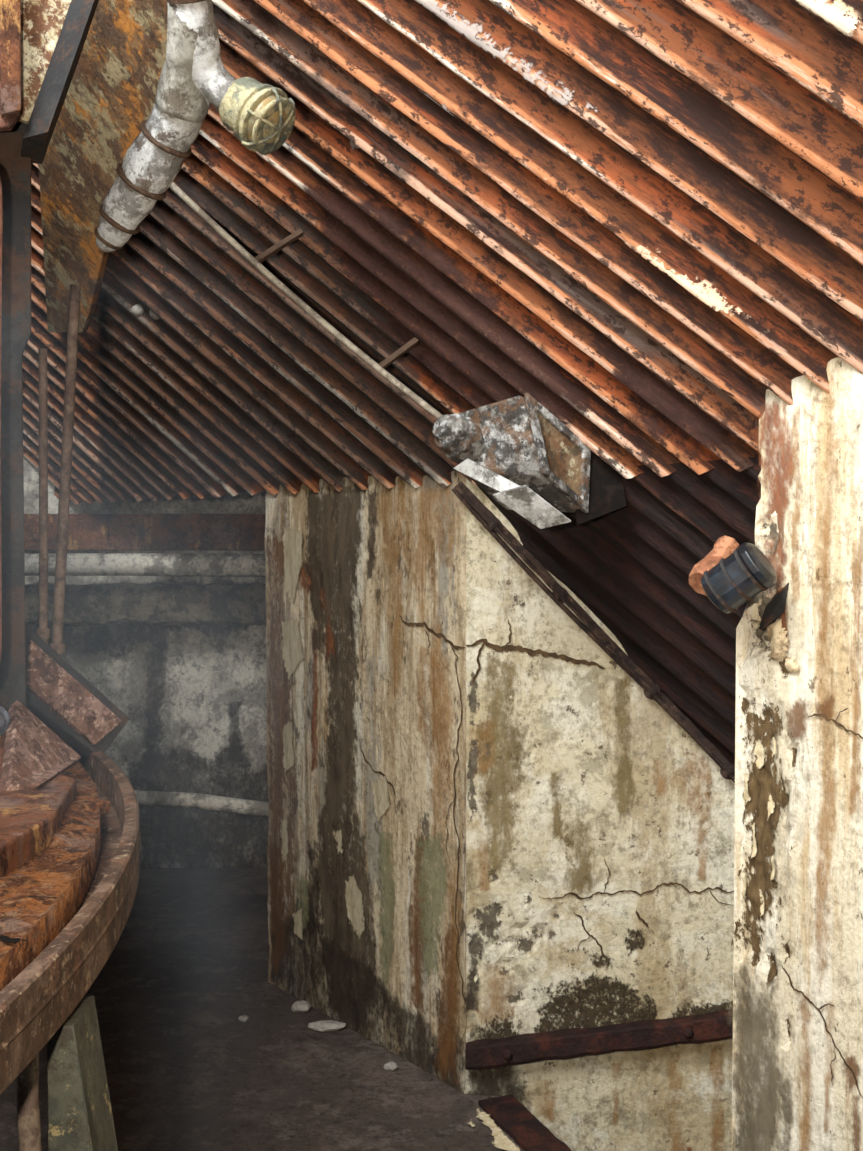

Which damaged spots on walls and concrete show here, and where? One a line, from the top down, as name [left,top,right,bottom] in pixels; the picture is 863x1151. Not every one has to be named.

peeling [796,0,860,38]
rust [304,186,590,425]
rust [611,350,735,460]
spalling [747,591,789,678]
water stain [271,483,525,1102]
crack [399,615,605,1048]
spalling [731,697,797,985]
water stain [534,947,659,1033]
water stain [623,928,645,955]
crack [540,859,734,958]
water stain [671,966,792,1151]
crack [782,966,863,1098]